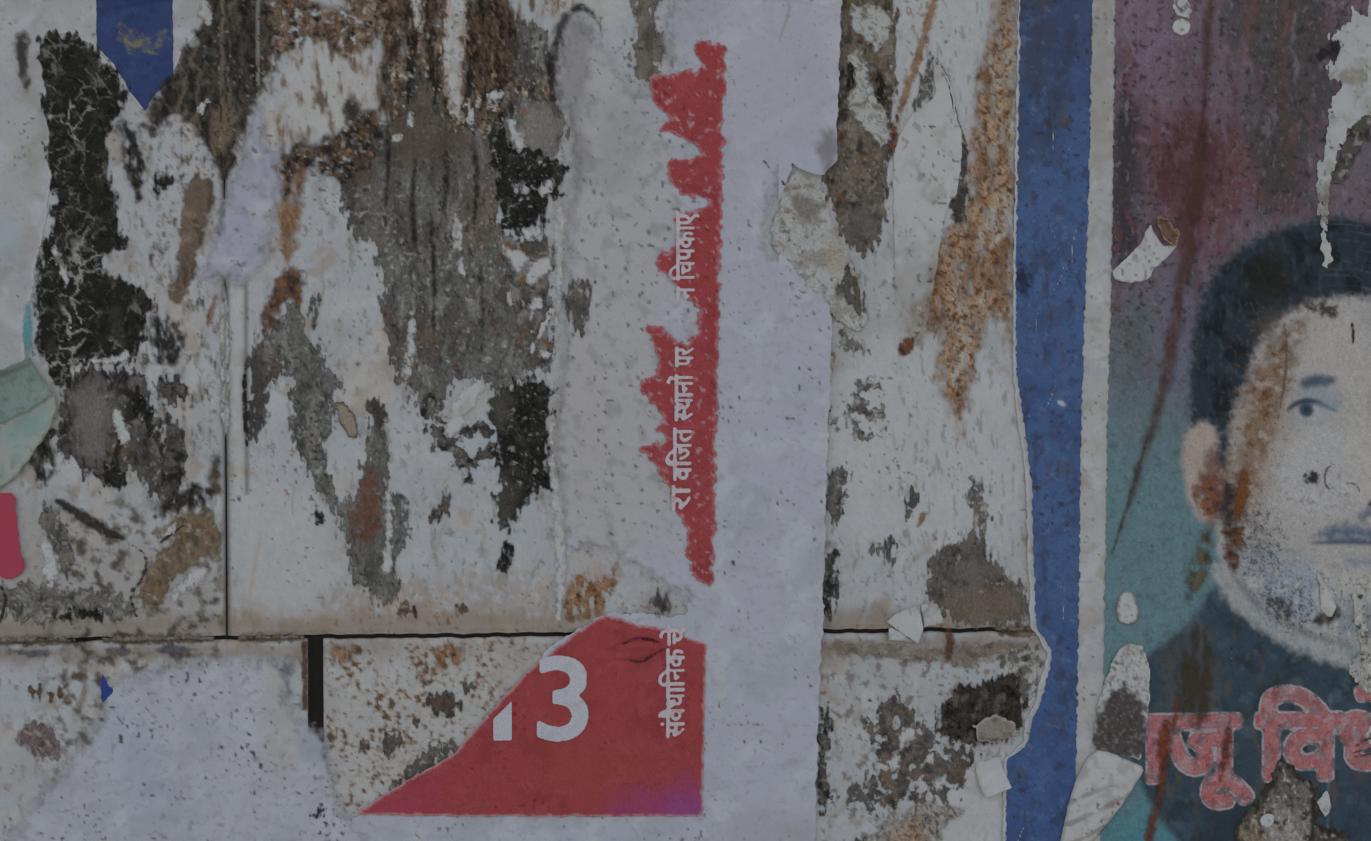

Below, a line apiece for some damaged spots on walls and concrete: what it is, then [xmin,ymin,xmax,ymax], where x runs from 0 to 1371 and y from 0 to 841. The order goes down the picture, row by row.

peeling [51,245,69,284]
peeling [77,350,130,364]
spalling [219,287,417,619]
spalling [339,0,596,438]
peeling [548,423,567,622]
spalling [822,0,962,302]
corrosion [888,0,937,152]
corrosion [899,0,1017,421]
corrosion [1113,335,1175,549]
spalling [828,475,1044,818]
peeling [1260,814,1274,827]
peeling [1317,791,1331,816]